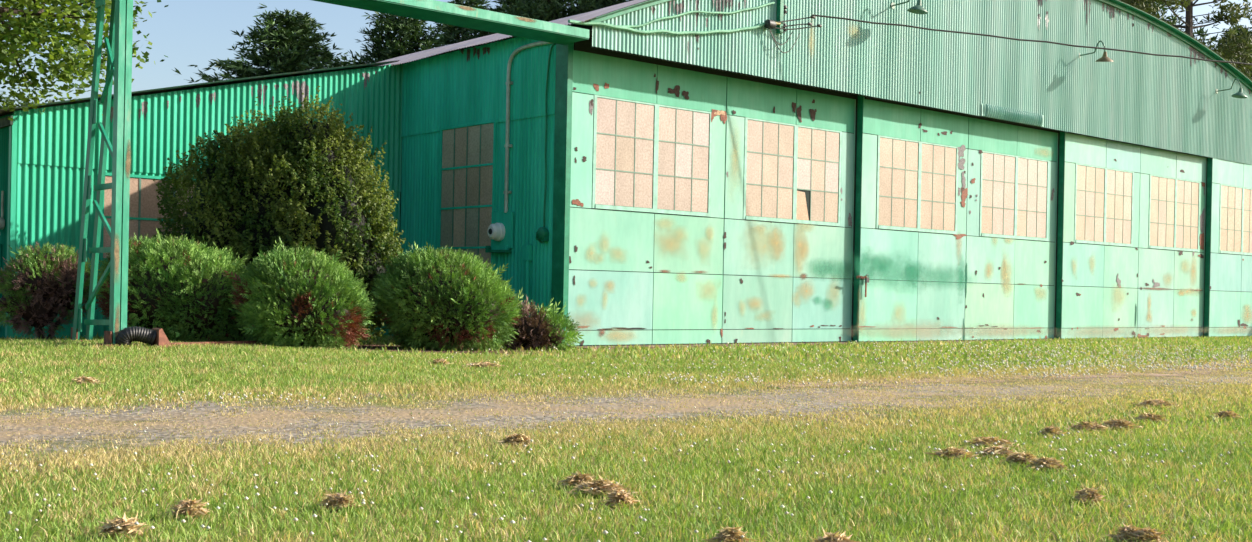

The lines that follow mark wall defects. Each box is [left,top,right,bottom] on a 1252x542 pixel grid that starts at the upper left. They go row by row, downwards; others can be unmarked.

peeling [1084,0,1172,37]